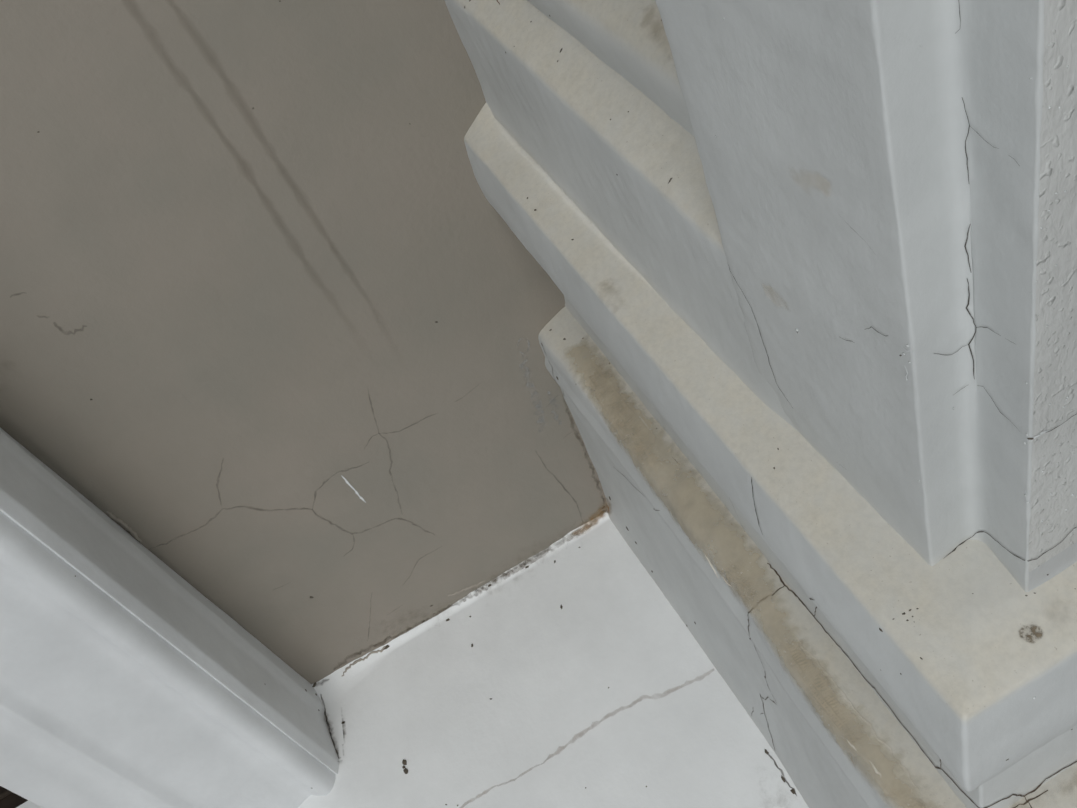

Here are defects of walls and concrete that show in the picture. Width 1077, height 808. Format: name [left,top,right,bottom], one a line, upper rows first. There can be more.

crack [962,98,1019,181]
crack [934,226,1076,435]
crack [947,527,1076,561]
crack [748,563,1077,808]